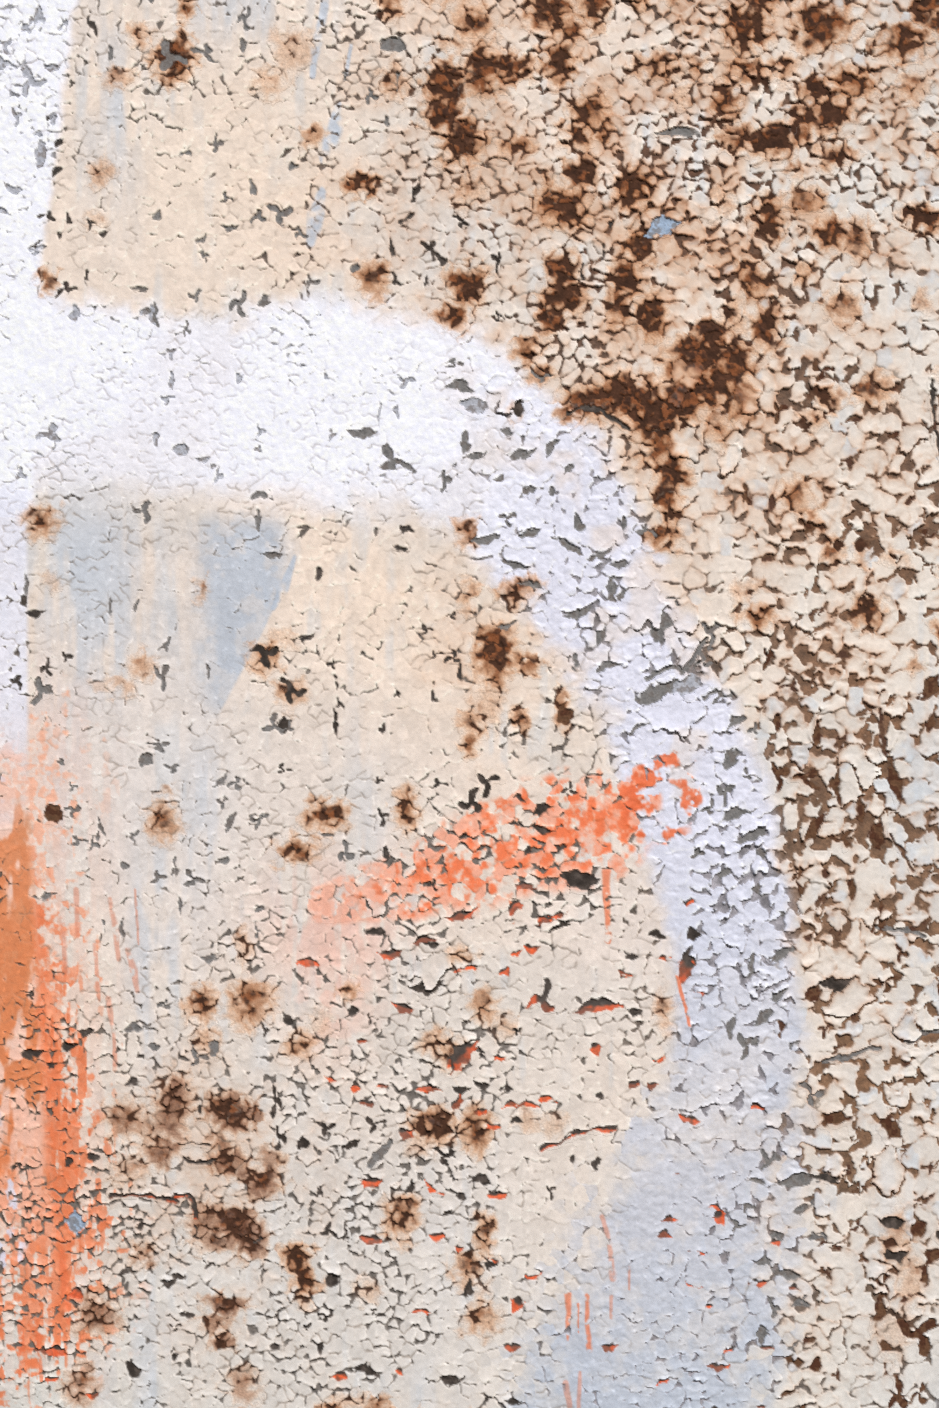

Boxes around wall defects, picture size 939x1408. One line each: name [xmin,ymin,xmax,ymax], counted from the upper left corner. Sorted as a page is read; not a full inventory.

crack [0,0,179,184]
crack [118,0,272,204]
rust [371,0,939,558]
rust [451,569,574,763]
crack [214,0,939,1408]
peeling [916,675,939,733]
rust [92,922,365,1315]
crack [0,774,632,1408]
peeling [748,1149,820,1187]
peeling [805,945,912,1055]
rust [187,1286,268,1408]
peeling [748,1231,840,1381]